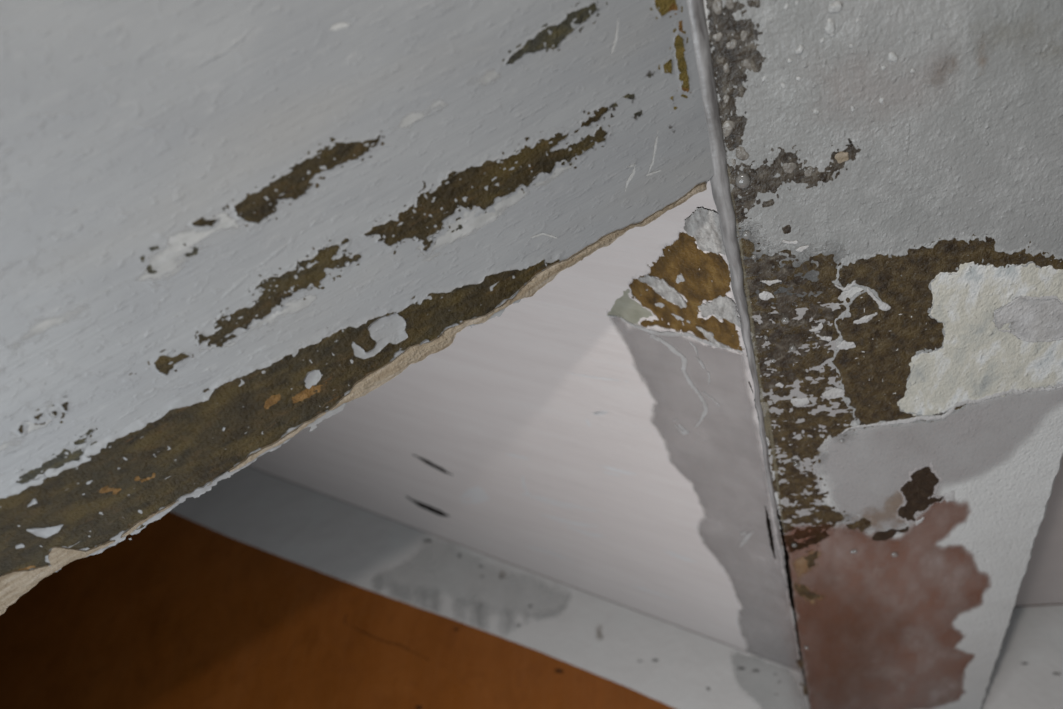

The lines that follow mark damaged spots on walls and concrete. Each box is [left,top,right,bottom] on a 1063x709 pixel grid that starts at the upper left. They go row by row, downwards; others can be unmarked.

peeling [481,0,608,84]
peeling [648,0,694,110]
peeling [0,182,746,615]
peeling [139,94,635,378]
leakage [615,0,1063,709]
spalling [827,232,1063,434]